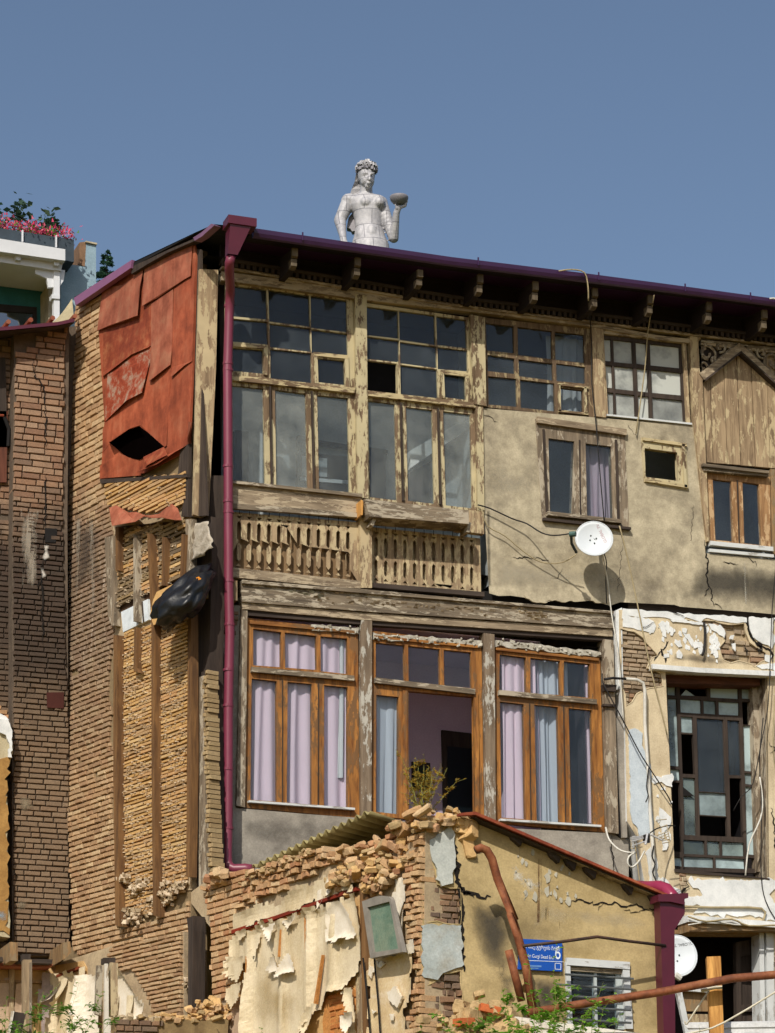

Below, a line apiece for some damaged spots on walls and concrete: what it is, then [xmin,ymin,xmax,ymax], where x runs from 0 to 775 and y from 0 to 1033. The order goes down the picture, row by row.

crack [690,505,757,609]
spalling [511,593,572,621]
crack [643,612,685,663]
spalling [620,608,775,706]
crack [744,616,774,658]
flaking render [0,719,13,758]
flaking render [628,728,775,921]
spalling [200,803,480,1033]
crack [454,840,491,971]
crack [564,899,654,913]
spalling [110,963,245,1024]